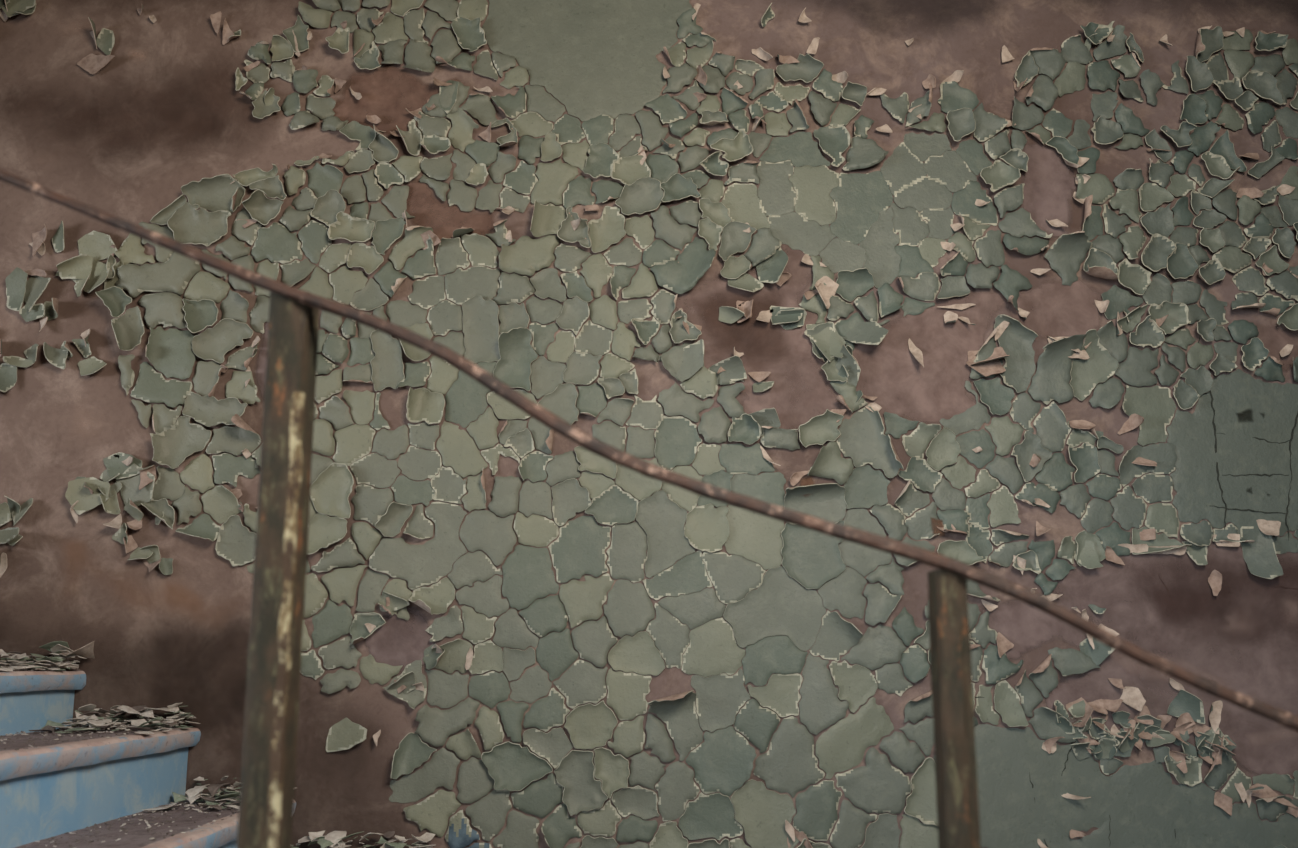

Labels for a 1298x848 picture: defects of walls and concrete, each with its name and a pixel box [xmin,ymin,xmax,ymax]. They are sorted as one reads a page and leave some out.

peeling [77,17,115,74]
peeling [0,221,270,577]
peeling [139,0,1298,716]
crack [1198,336,1298,541]
peeling [59,641,95,659]
peeling [301,311,939,848]
peeling [967,579,1298,821]
water stain [1244,571,1296,594]
peeling [1069,829,1086,839]